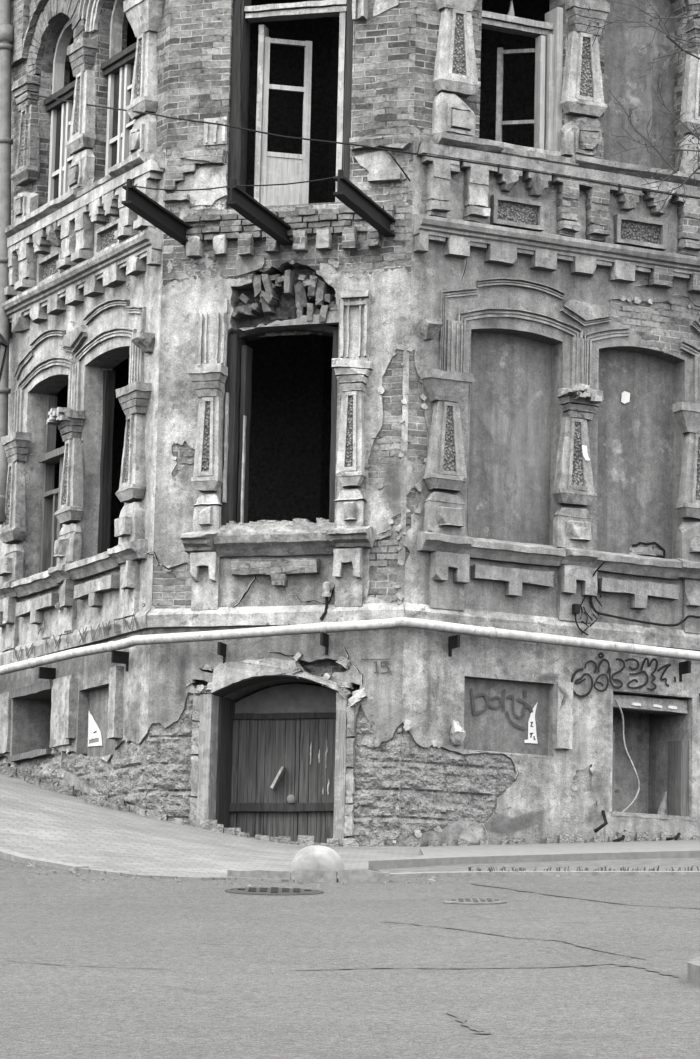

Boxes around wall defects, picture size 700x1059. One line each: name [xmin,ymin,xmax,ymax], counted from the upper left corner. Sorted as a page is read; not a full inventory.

spalling [319,258,342,285]
spalling [365,348,428,605]
spalling [0,664,214,825]
spalling [289,652,516,845]